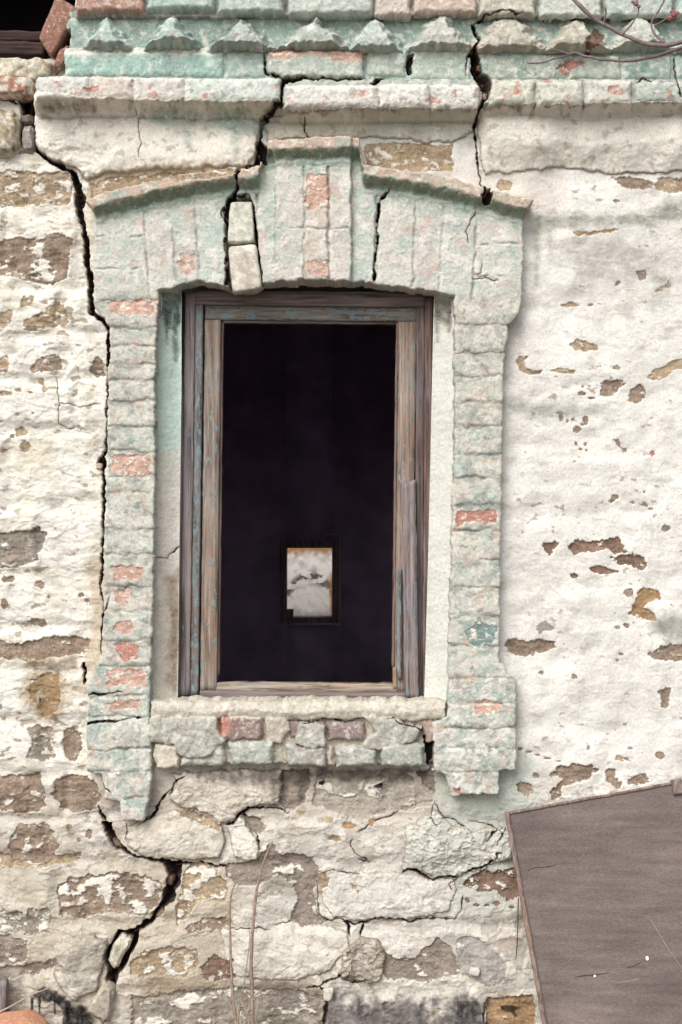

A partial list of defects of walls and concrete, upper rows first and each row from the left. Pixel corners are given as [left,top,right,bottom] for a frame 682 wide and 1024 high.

crack [465,9,523,241]
crack [220,44,414,286]
peeling [364,142,454,172]
peeling [578,359,682,404]
crack [9,101,141,725]
peeling [0,526,48,583]
peeling [542,537,647,574]
peeling [465,617,555,657]
peeling [614,588,661,629]
peeling [516,746,649,800]
crack [98,775,227,983]
crack [225,801,506,937]